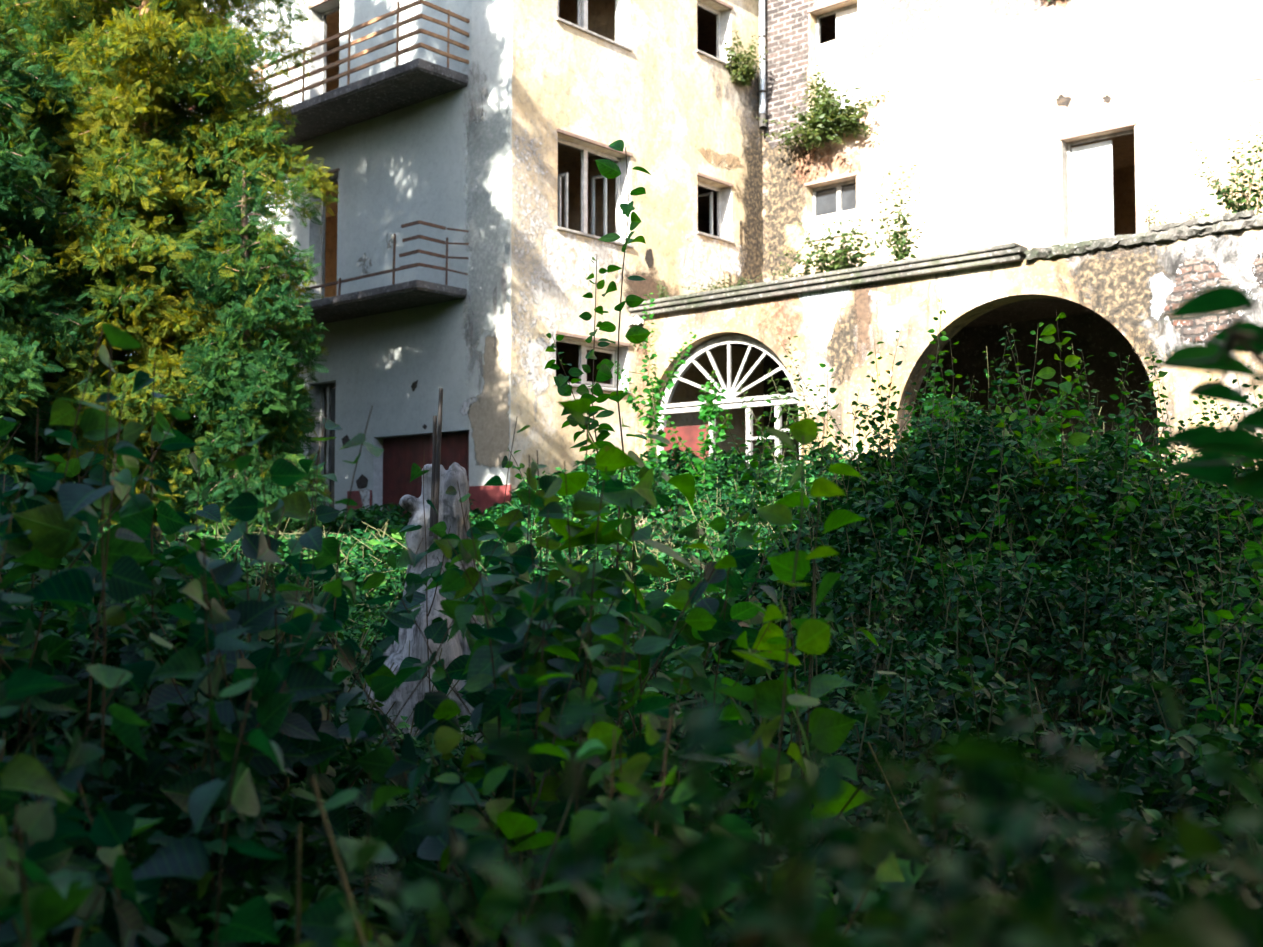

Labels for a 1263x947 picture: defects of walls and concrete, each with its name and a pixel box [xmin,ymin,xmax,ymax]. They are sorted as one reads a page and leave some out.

peeling [1222,143,1263,205]
flaking render [797,286,851,356]
flaking render [1061,231,1263,368]